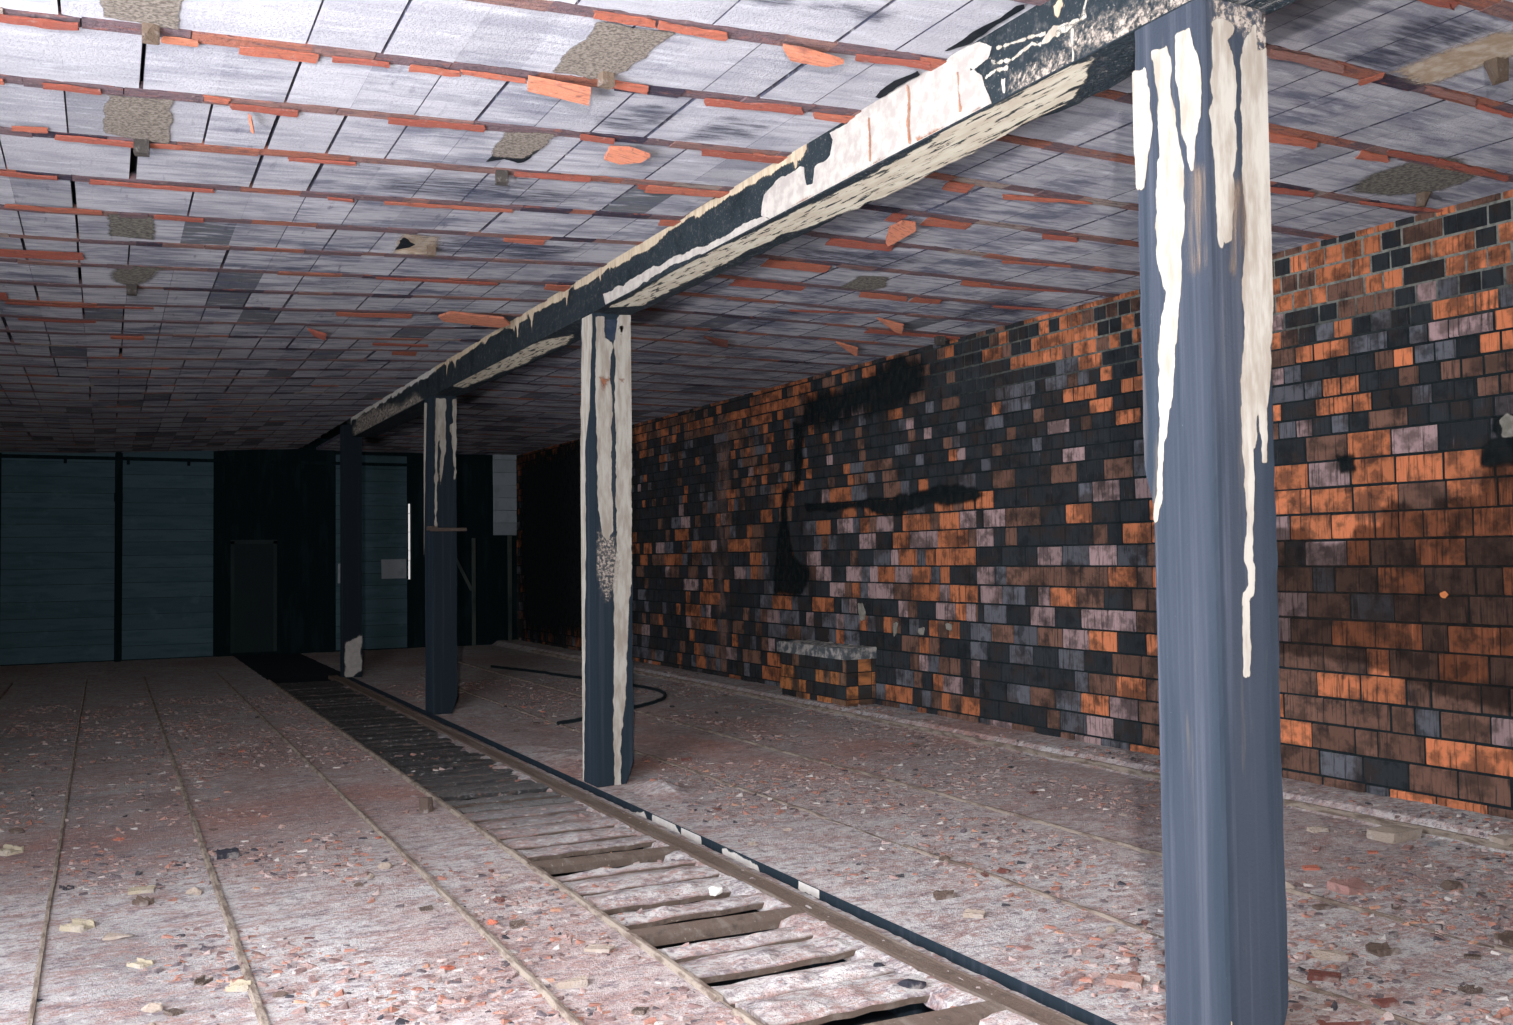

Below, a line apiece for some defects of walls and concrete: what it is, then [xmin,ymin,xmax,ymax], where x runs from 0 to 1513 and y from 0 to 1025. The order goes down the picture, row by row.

flaking render [0,14,79,31]
flaking render [99,0,199,47]
flaking render [553,10,728,95]
flaking render [1213,0,1513,118]
flaking render [387,117,591,182]
flaking render [592,0,1190,341]
flaking render [1353,150,1509,213]
damp [351,144,807,422]
flaking render [453,335,573,388]
damp [1132,18,1273,678]
damp [424,398,457,528]
damp [518,314,632,785]